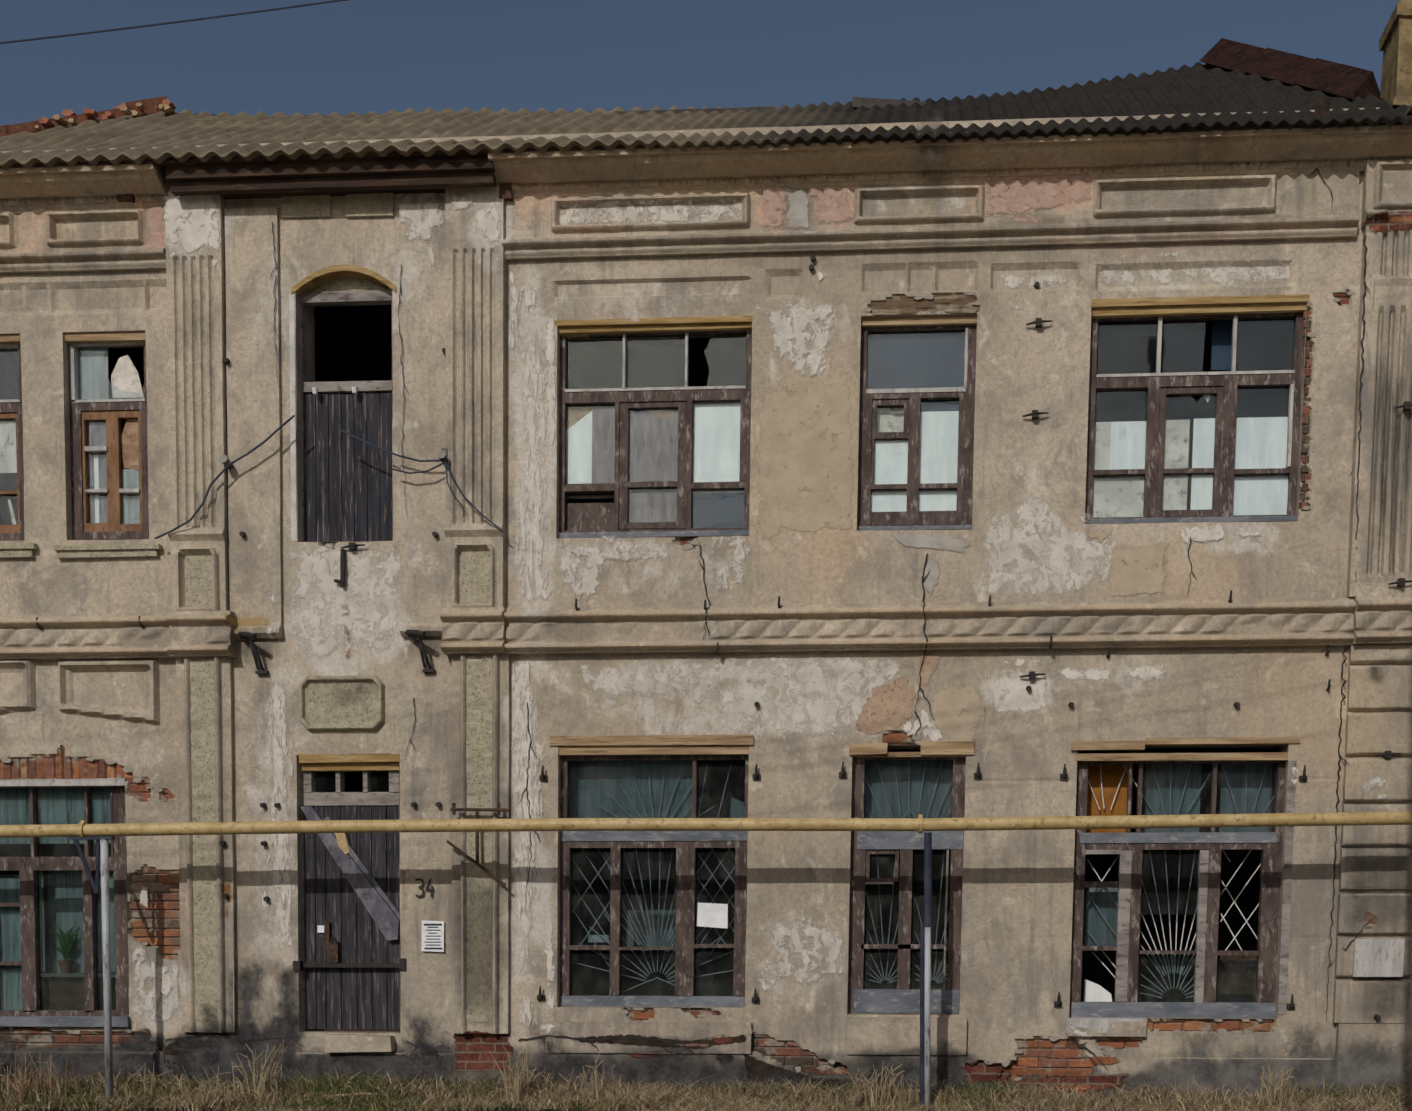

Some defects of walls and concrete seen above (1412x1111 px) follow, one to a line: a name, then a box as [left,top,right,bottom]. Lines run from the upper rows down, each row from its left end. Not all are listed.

flaking render [146,191,224,266]
flaking render [756,303,855,541]
flaking render [266,543,401,660]
crack [699,545,711,645]
crack [914,554,934,735]
flaking render [984,496,1116,600]
flaking render [581,652,1111,743]
flaking render [0,746,174,802]
flaking render [0,866,215,1078]
water stain [0,965,448,1091]
flaking render [578,1009,850,1087]
flaking render [961,1020,1275,1095]